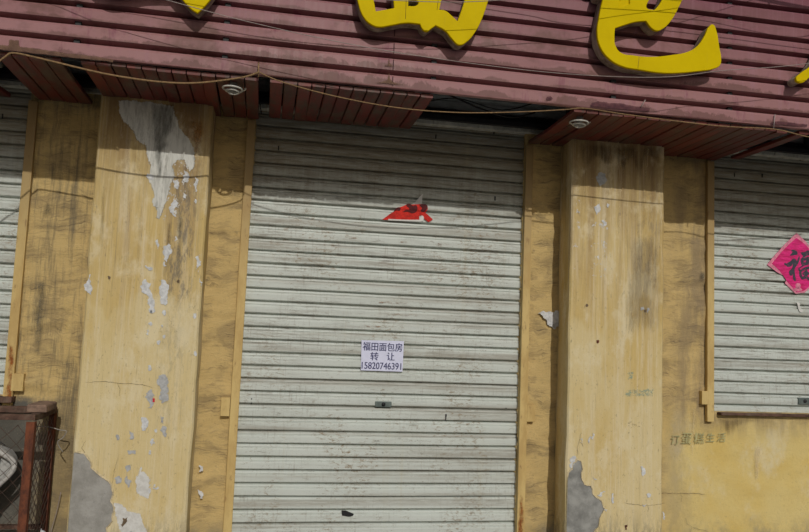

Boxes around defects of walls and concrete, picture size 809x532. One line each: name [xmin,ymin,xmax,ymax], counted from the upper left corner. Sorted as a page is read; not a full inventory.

peeling [118,100,199,219]
peeling [540,310,559,329]
peeling [145,374,169,408]
peeling [130,415,167,455]
spalling [67,451,159,532]
spalling [566,456,615,532]